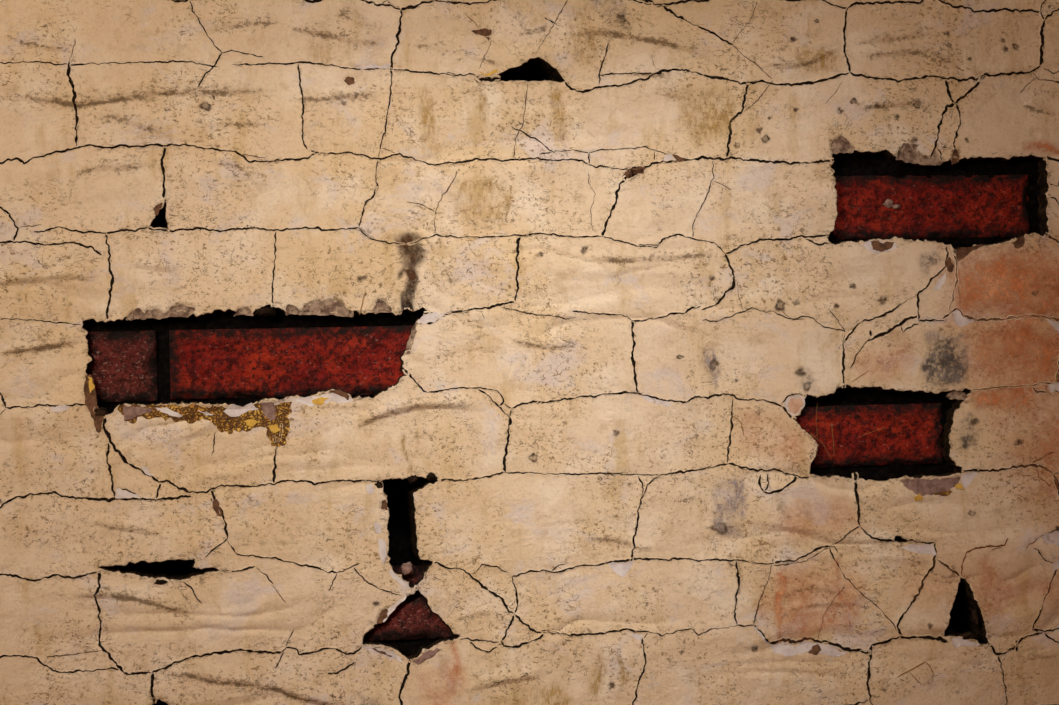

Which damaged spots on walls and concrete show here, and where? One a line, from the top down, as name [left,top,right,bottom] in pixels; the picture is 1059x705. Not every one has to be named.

crack [0,0,678,202]
spalling [474,54,568,85]
crack [564,0,1059,244]
leakage [397,233,422,311]
spalling [825,136,1051,290]
spalling [80,299,445,447]
crack [0,173,1059,705]
spalling [784,369,977,501]
mould [922,335,967,385]
spalling [96,556,232,585]
spalling [359,472,462,664]
spalling [928,576,992,648]